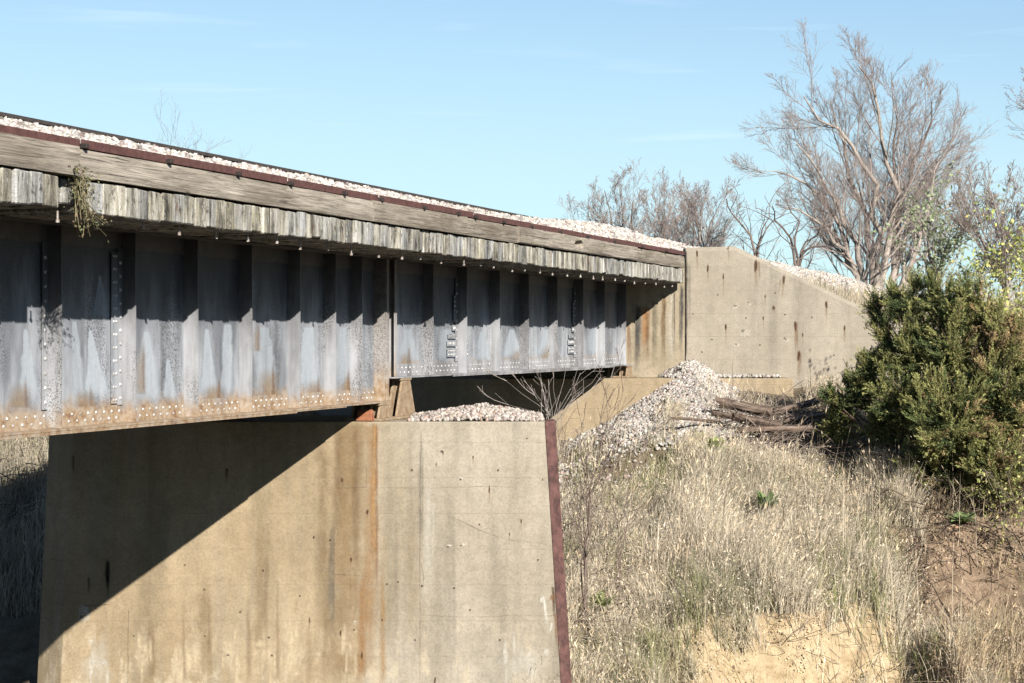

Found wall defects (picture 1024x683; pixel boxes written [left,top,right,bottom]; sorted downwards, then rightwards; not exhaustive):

peeling [20,330,36,393]
peeling [85,331,107,393]
peeling [138,332,176,395]
peeling [202,325,232,389]
peeling [301,328,318,382]